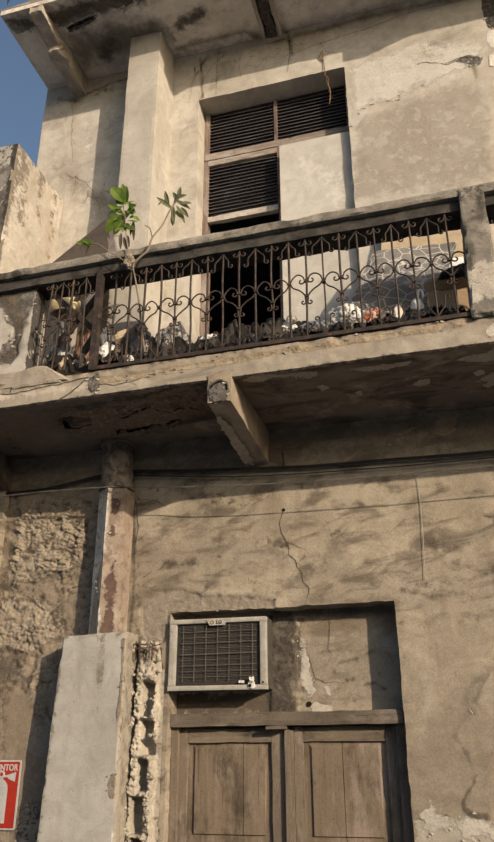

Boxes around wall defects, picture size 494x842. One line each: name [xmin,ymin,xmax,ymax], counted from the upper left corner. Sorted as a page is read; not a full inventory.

leakage [48,0,145,25]
leakage [70,22,157,64]
leakage [176,8,205,30]
peeling [481,0,494,29]
peeling [0,288,38,365]
flaking render [53,379,230,438]
peeling [216,416,254,466]
crack [279,512,310,603]
rust [98,560,117,633]
spalling [106,589,333,842]
peeling [419,800,494,842]
leakage [463,781,490,820]